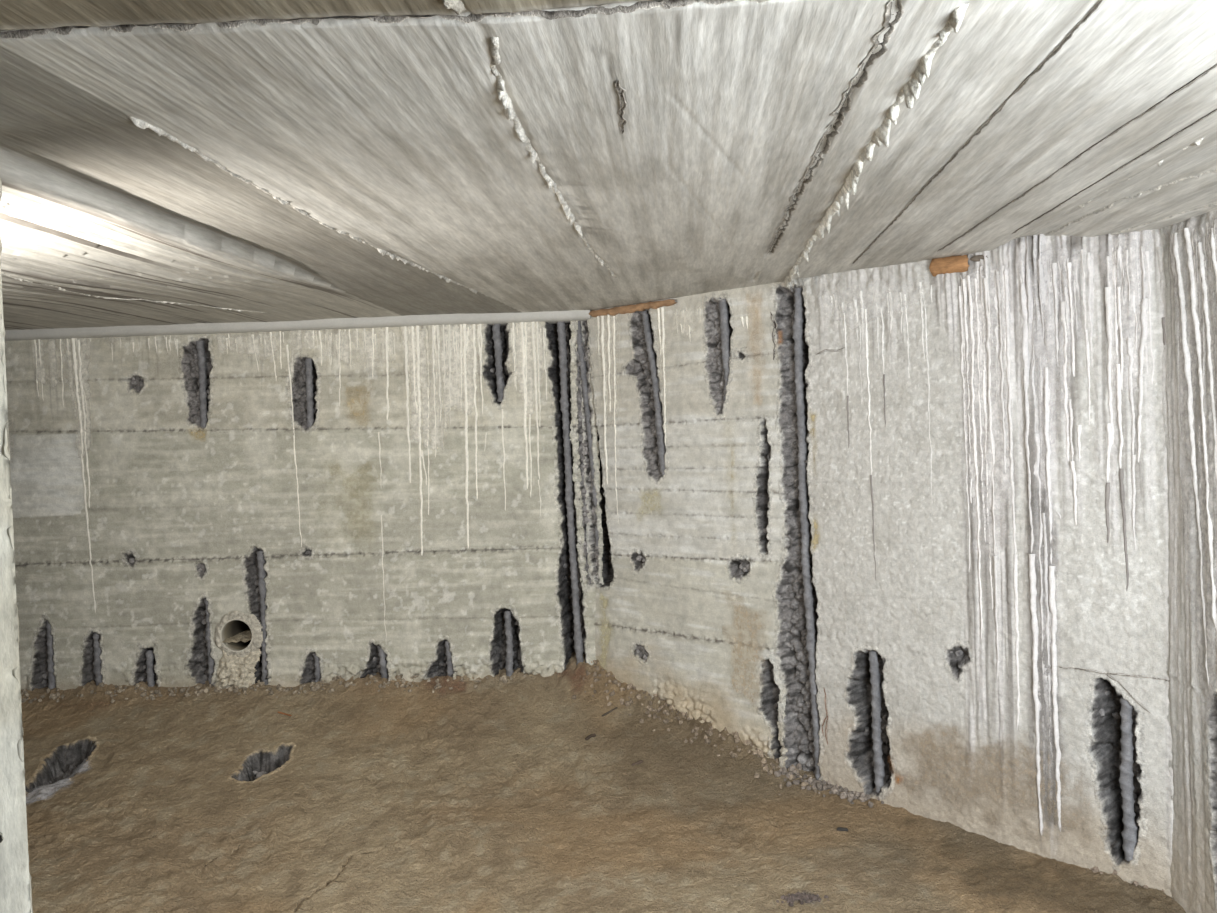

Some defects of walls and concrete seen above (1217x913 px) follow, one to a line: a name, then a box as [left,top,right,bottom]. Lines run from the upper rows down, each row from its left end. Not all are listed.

crack [0,0,770,39]
crack [767,0,904,254]
crack [852,0,1103,264]
crack [937,64,1217,252]
water stain [299,324,487,555]
water stain [511,322,547,515]
spalling [542,320,652,673]
spalling [724,281,825,781]
water stain [822,282,933,580]
water stain [907,220,1217,836]
spalling [842,644,898,800]
spalling [1084,673,1150,871]